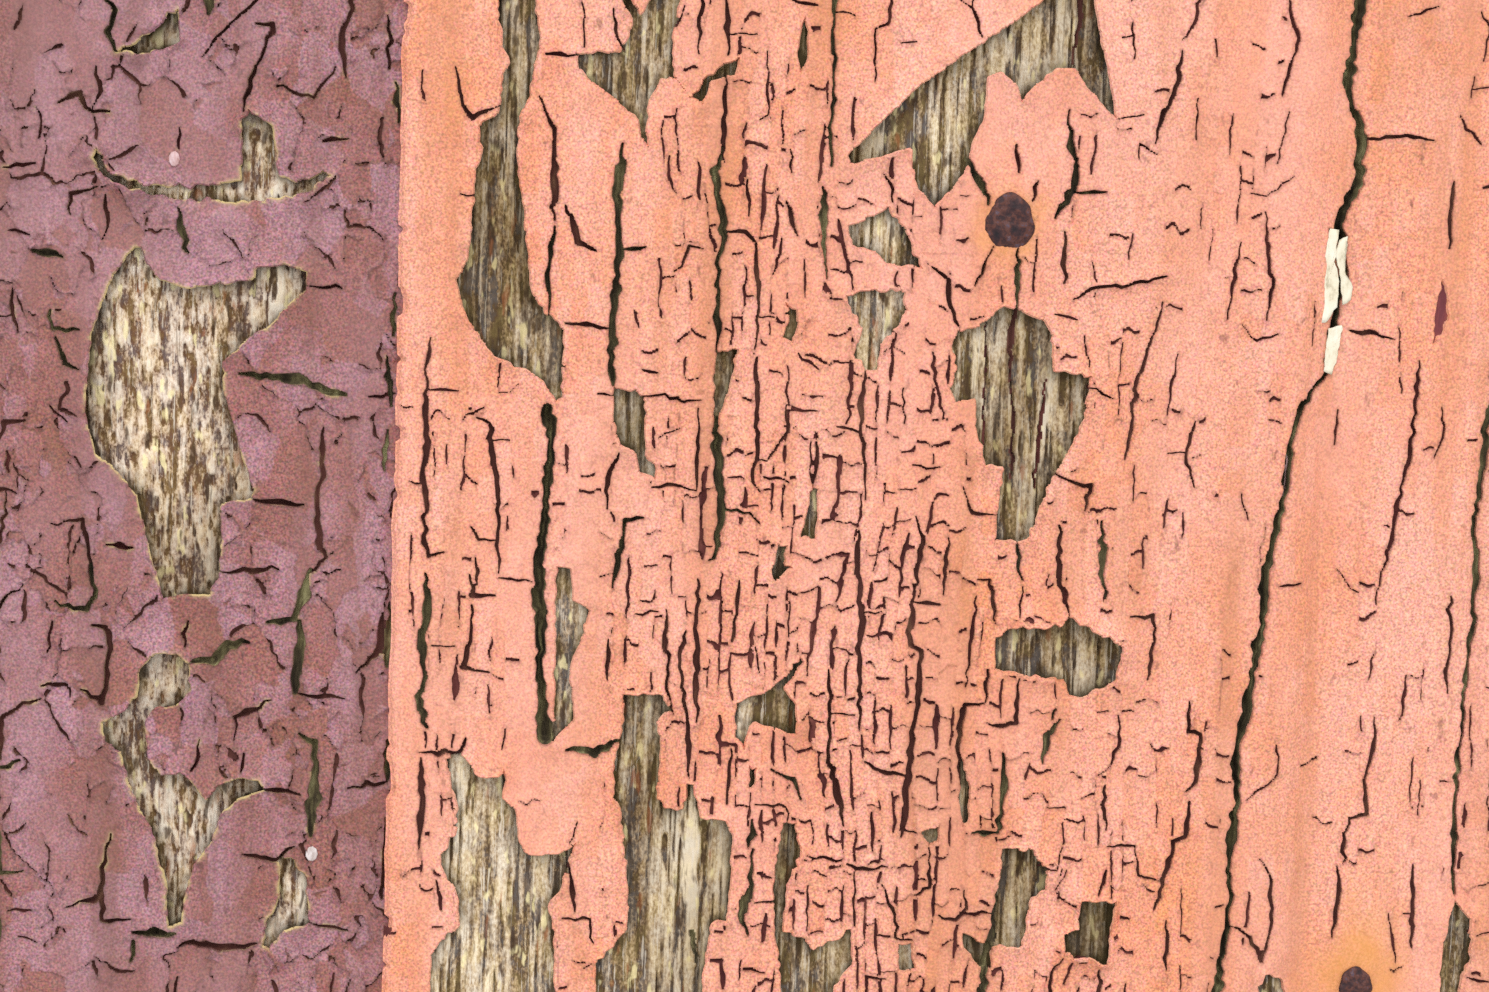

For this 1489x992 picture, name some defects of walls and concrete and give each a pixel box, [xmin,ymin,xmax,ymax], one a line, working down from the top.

peeling [448,0,829,413]
peeling [822,0,1141,370]
crack [1367,12,1489,145]
crack [0,0,263,992]
peeling [58,86,349,965]
peeling [950,290,1113,555]
crack [1336,304,1489,621]
peeling [408,551,873,992]
peeling [887,832,1131,992]
rust [1281,865,1419,992]
crack [1314,596,1489,937]
crack [1388,864,1415,972]